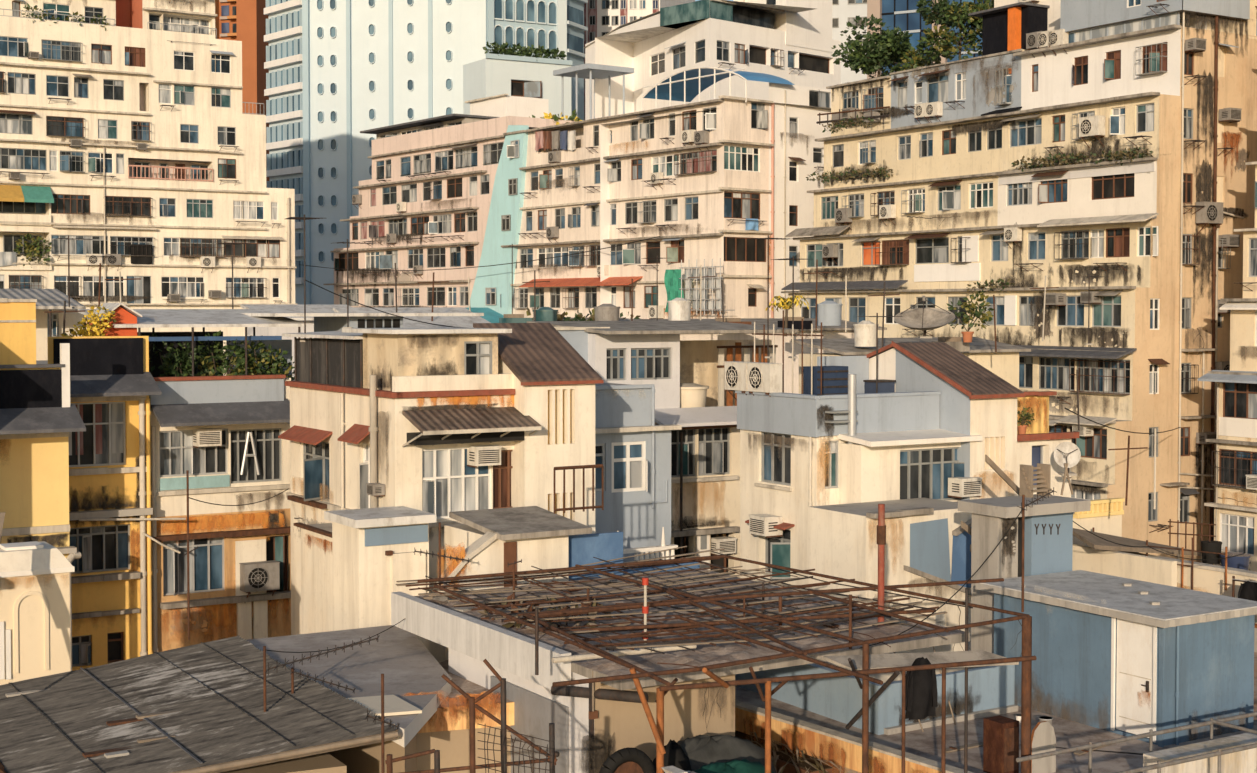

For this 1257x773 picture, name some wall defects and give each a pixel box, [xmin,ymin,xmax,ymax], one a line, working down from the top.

leakage [1186,12,1248,50]
leakage [1193,72,1247,295]
leakage [7,453,147,546]
corrosion [157,510,284,534]
corrosion [438,545,465,588]
corrosion [162,603,237,638]
corrosion [406,691,501,721]